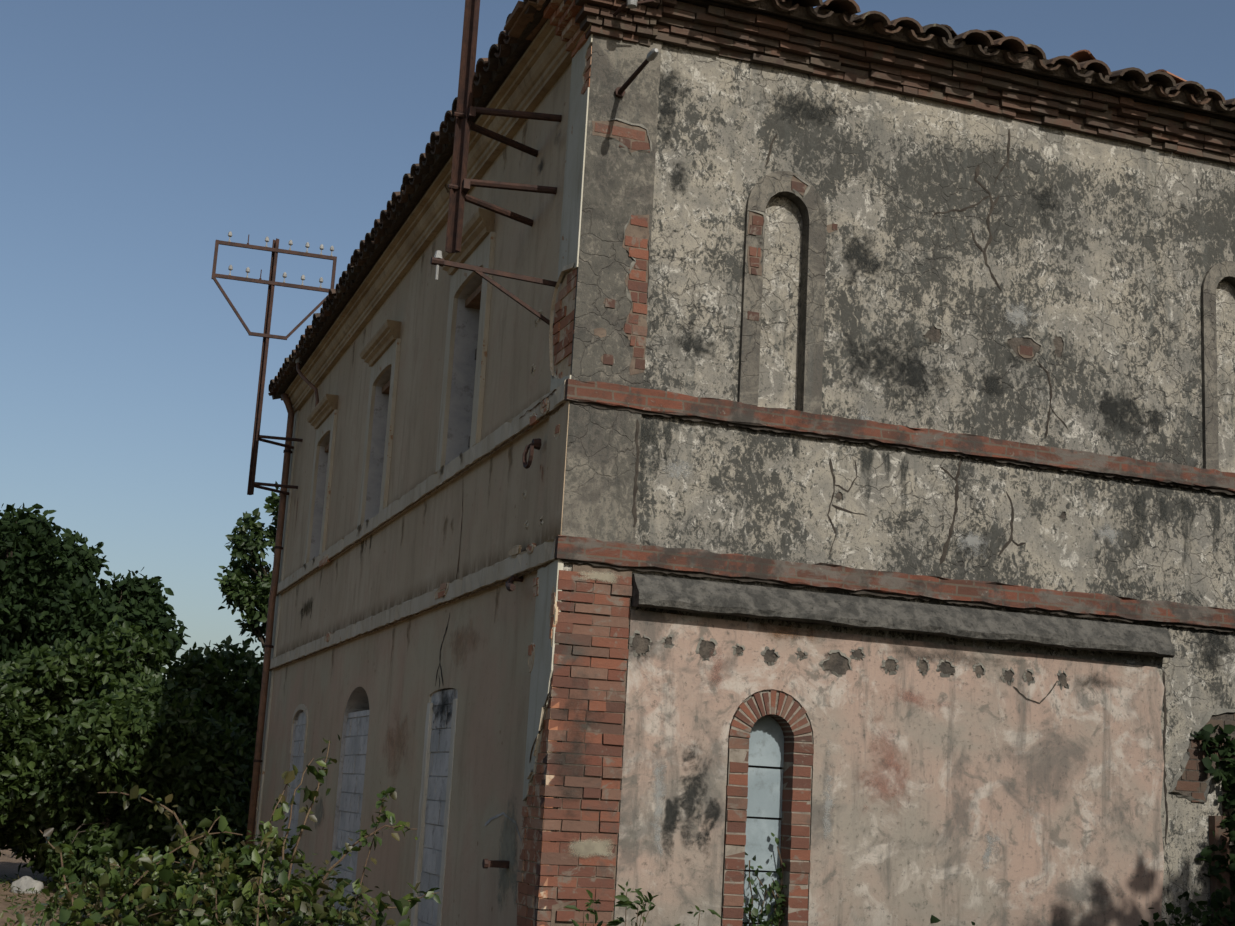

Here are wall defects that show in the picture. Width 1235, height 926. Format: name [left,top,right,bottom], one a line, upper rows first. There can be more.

spalling [592,118,652,156]
water stain [657,71,687,135]
spalling [535,262,577,379]
spalling [601,214,651,375]
water stain [846,334,943,396]
water stain [1100,392,1166,436]
crack [828,458,867,555]
water stain [861,448,908,506]
spalling [533,576,560,647]
spalling [1169,708,1235,803]
water stain [654,768,678,854]
water stain [697,801,721,845]